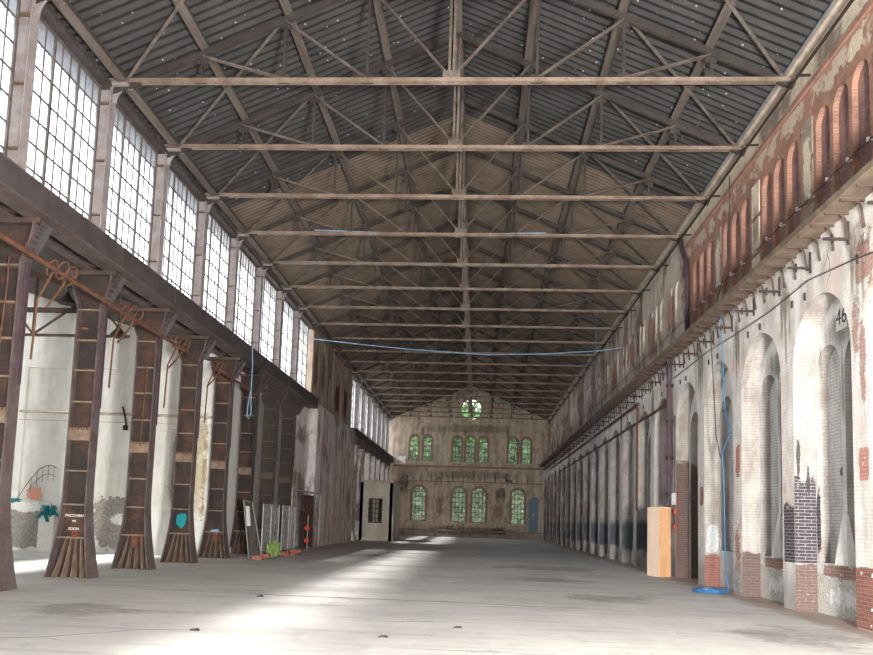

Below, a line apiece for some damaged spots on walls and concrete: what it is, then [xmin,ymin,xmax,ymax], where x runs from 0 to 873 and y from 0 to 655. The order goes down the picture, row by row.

peeling [847,0,869,67]
peeling [801,132,812,207]
spalling [859,447,869,481]
peeling [93,492,125,551]
spalling [691,464,720,586]
spalling [796,563,873,631]